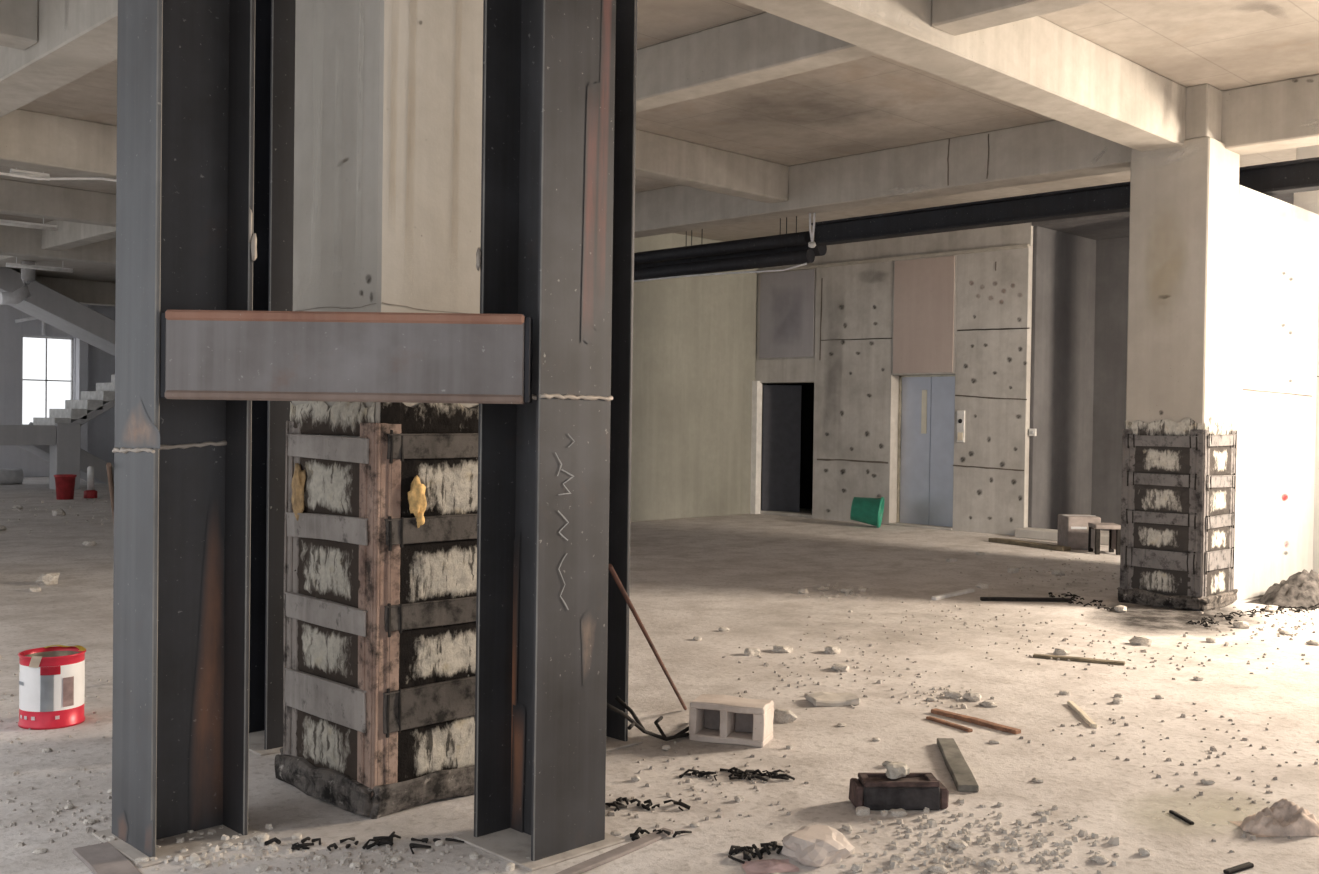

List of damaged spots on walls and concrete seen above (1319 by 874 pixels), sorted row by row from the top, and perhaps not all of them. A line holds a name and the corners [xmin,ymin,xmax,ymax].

corrosion [581,0,613,345]
crack [944,139,952,186]
crack [983,134,991,179]
corrosion [189,492,225,831]
corrosion [510,532,525,833]